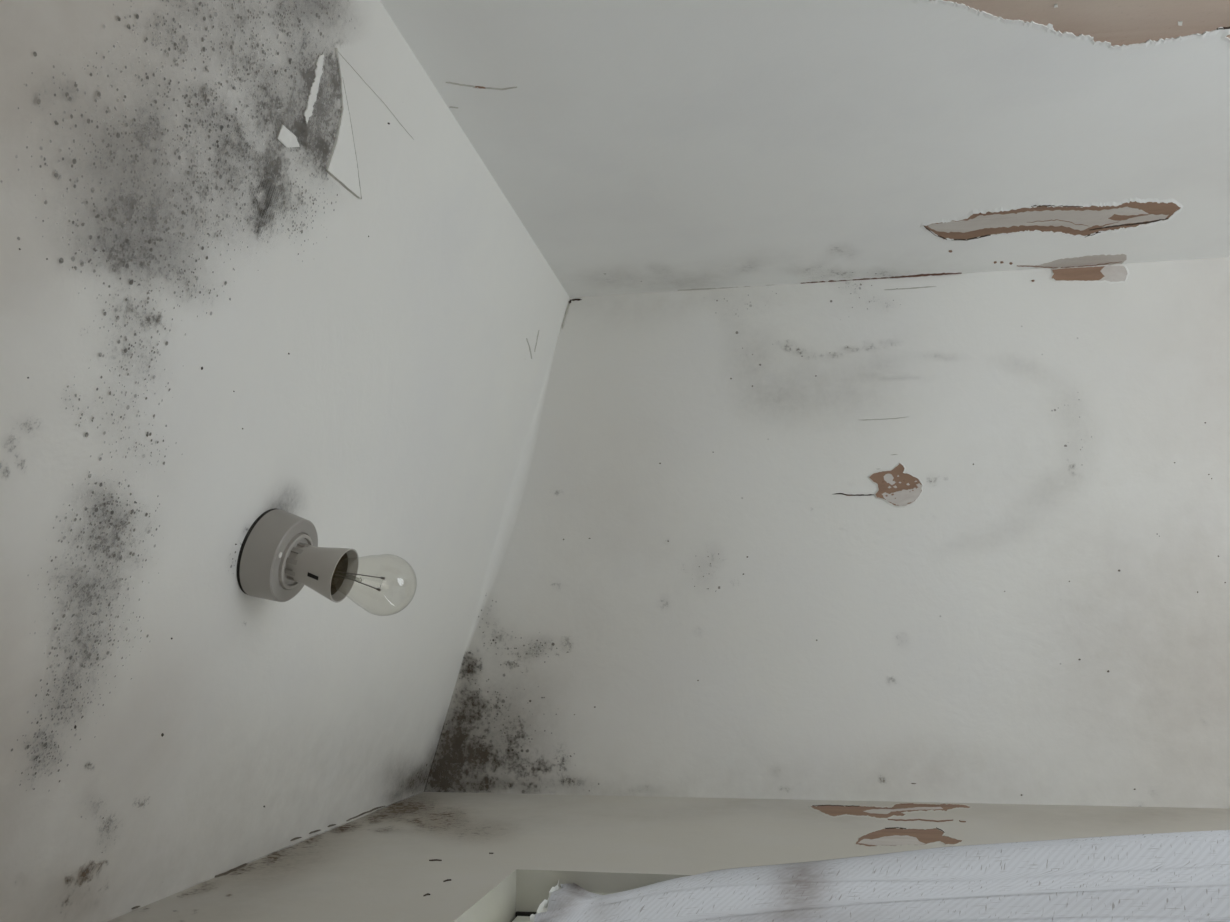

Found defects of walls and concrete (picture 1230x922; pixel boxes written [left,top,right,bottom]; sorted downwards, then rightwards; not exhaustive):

peeling [911,0,1230,51]
peeling [919,197,1183,253]
peeling [994,254,1130,284]
leakage [11,0,352,790]
spalling [867,462,924,508]
leakage [228,652,575,875]
peeling [809,803,972,848]